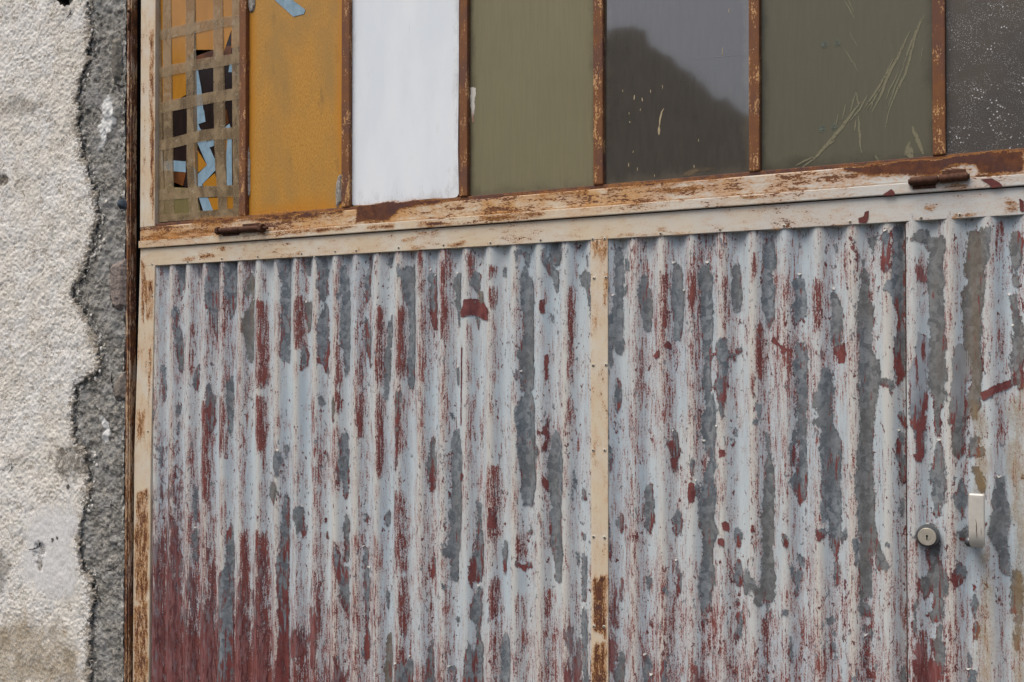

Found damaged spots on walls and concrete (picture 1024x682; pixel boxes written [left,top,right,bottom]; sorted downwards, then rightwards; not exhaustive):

rust [151,198,457,261]
rust [607,176,728,207]
rust [840,150,1024,176]
spalling [72,0,127,682]
peeling [151,243,591,682]
peeling [608,219,1024,682]
rust [133,488,149,682]
rust [591,575,608,682]